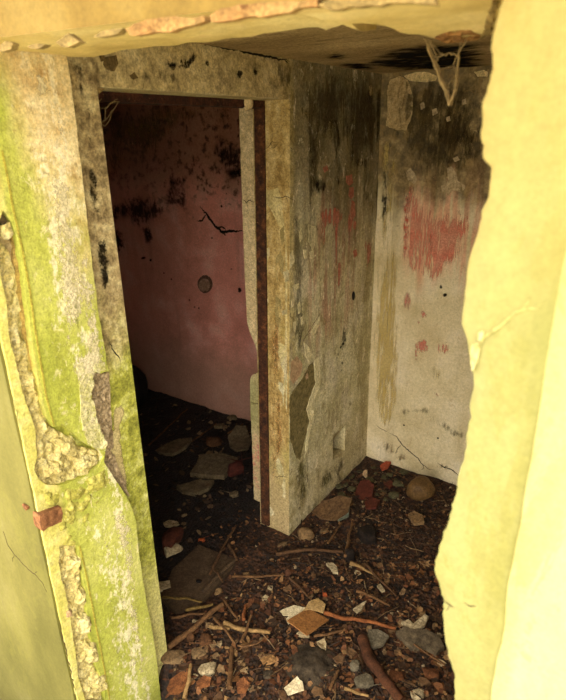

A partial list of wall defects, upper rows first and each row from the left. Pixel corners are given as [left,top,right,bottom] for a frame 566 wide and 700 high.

flaking render [386,72,438,131]
damp [89,170,98,213]
damp [112,178,186,243]
crack [197,206,242,236]
peeling [441,156,465,195]
damp [98,241,109,289]
damp [294,220,304,346]
spalling [0,179,129,496]
damp [377,255,397,424]
flaking render [289,343,321,460]
crack [380,428,459,476]
spalling [58,545,108,700]